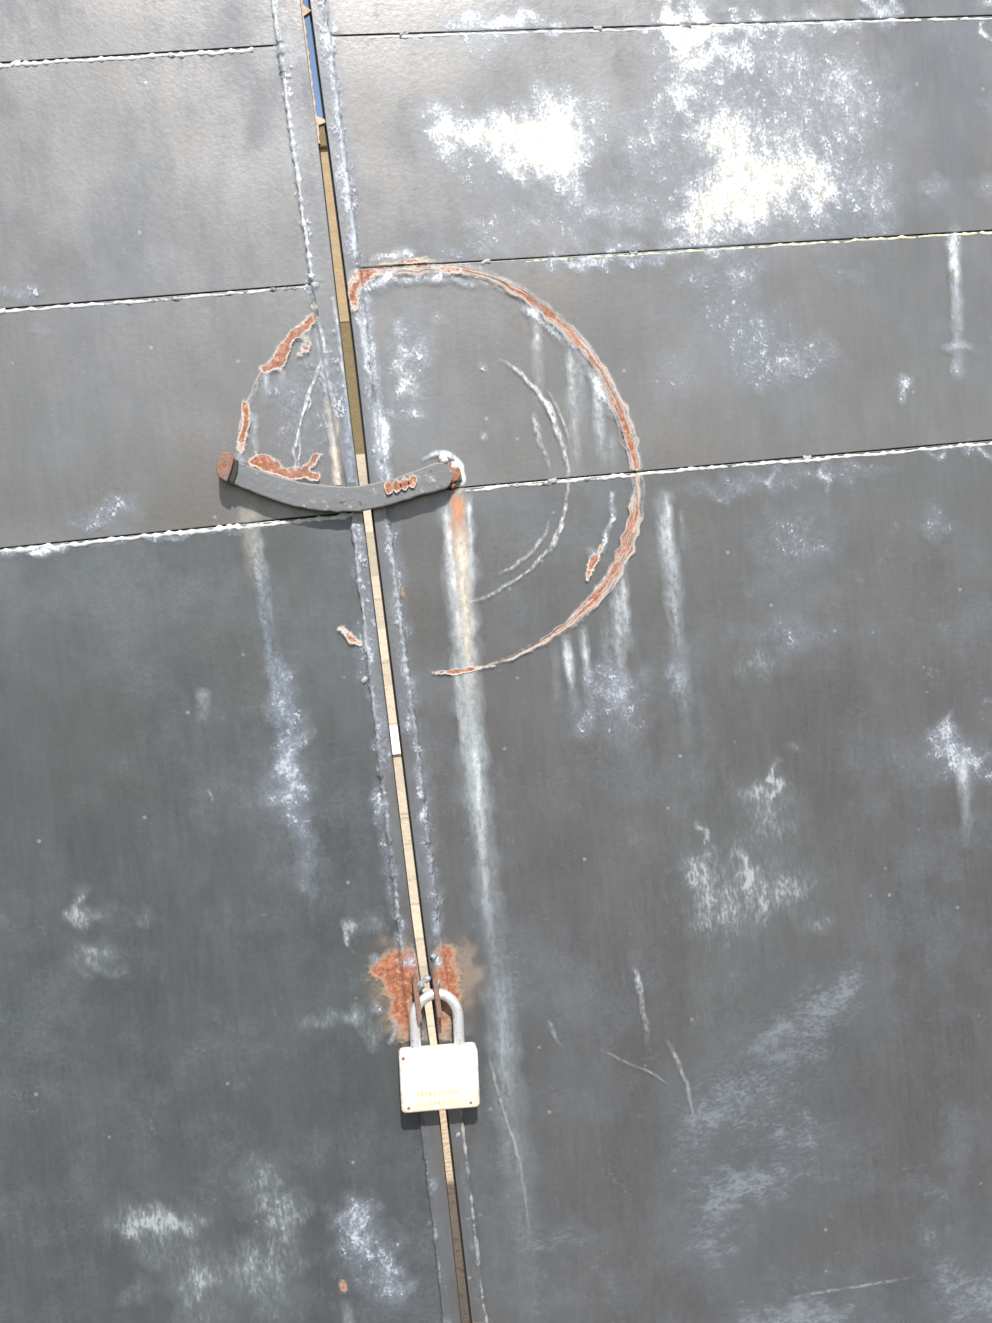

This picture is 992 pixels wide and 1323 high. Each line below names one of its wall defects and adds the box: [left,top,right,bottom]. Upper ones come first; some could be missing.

leakage [422,0,895,390]
leakage [948,233,960,280]
corrosion [348,249,643,675]
corrosion [337,626,362,646]
leakage [445,495,473,692]
leakage [269,661,309,828]
leakage [927,718,992,781]
leakage [686,826,806,928]
corrosion [369,948,423,1042]
corrosion [435,944,482,1040]
leakage [122,1205,205,1244]
leakage [338,1198,403,1296]